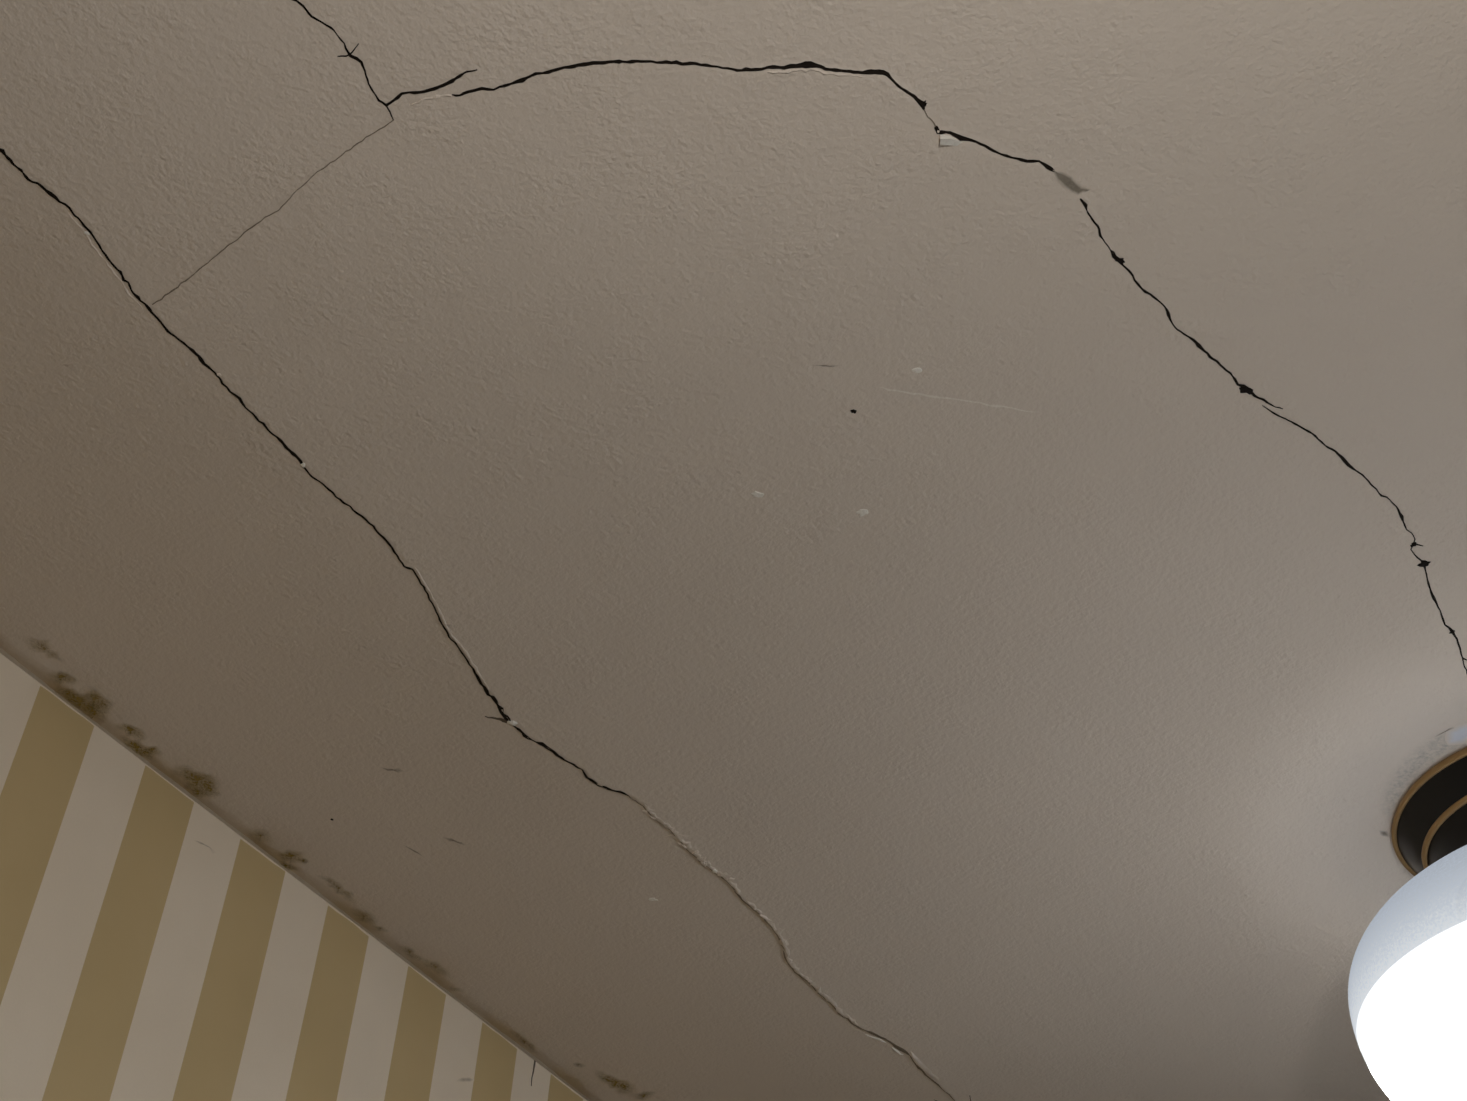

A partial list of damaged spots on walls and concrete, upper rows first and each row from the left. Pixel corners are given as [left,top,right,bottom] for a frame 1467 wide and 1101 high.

crack [0,0,1055,1101]
crack [1080,198,1467,674]